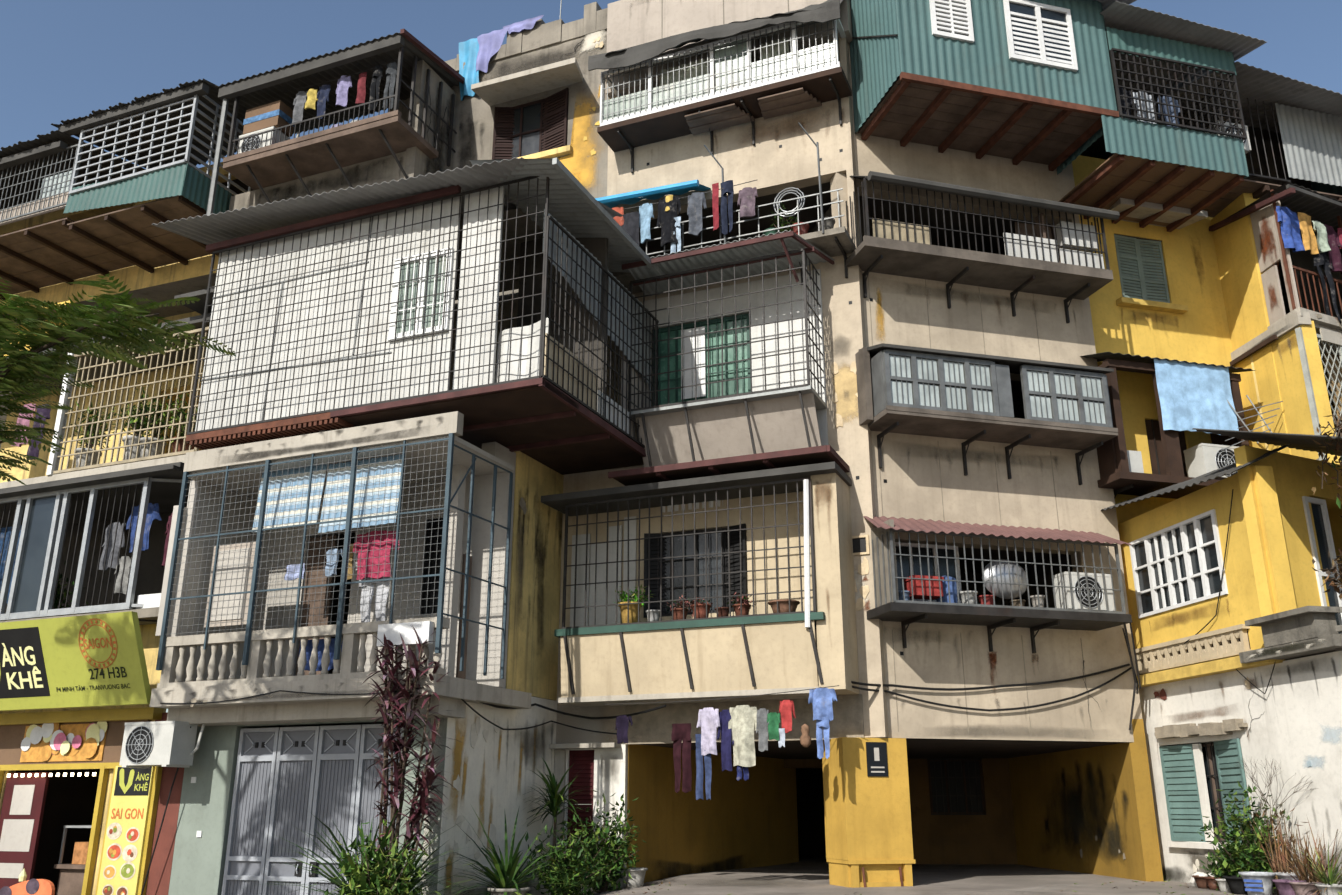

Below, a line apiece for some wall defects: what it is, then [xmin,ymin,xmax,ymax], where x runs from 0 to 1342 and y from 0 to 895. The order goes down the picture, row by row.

peeling [558,88,600,187]
peeling [831,340,859,429]
leakage [519,515,545,584]
peeling [1306,757,1322,767]
leakage [1057,766,1127,855]